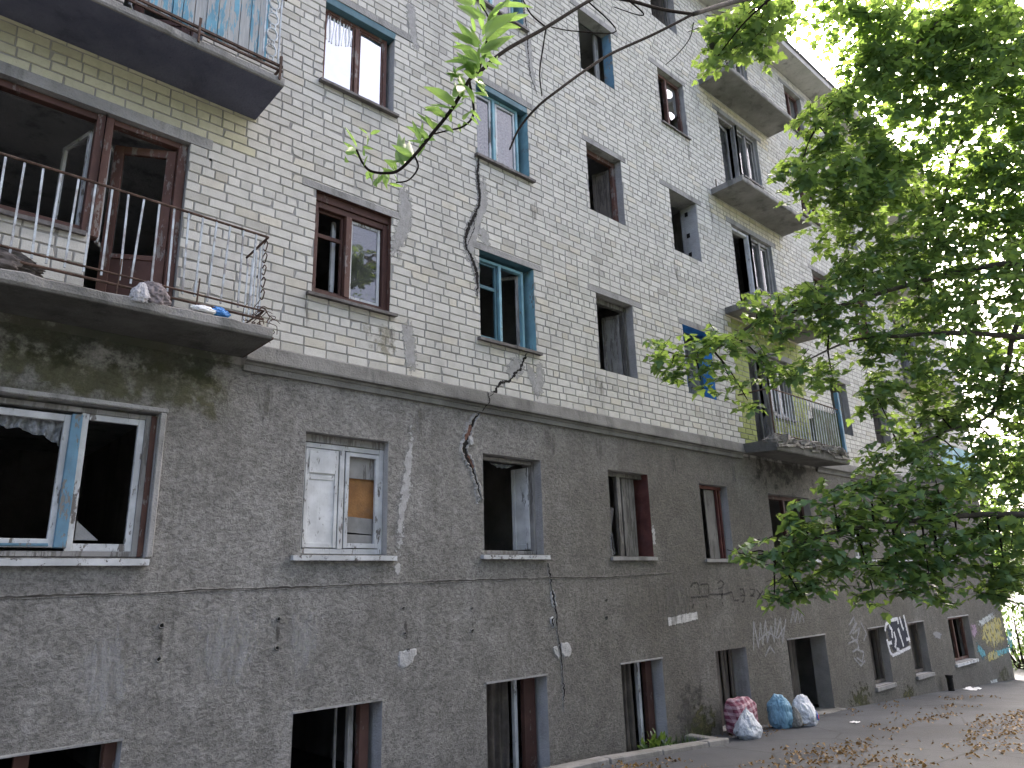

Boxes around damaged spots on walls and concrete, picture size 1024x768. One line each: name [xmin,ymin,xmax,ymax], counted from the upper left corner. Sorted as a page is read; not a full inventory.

crack [463,157,491,296]
water stain [1,348,222,415]
crack [459,353,544,504]
crack [547,563,571,712]